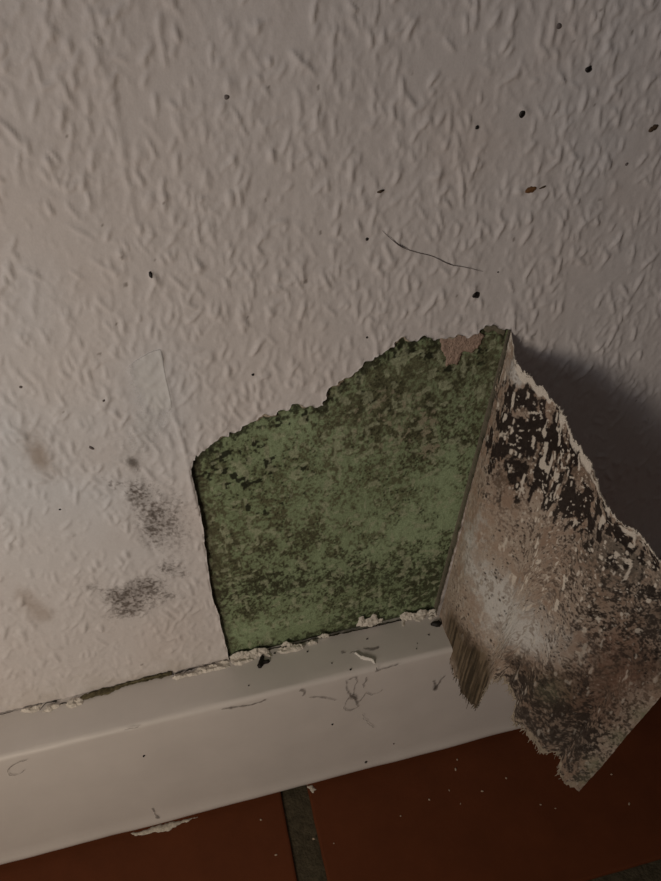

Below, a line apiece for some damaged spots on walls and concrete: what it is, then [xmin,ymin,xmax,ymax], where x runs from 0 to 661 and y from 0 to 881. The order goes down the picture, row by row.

water stain [131,485,176,543]
peeling [172,325,508,681]
water stain [109,580,157,615]